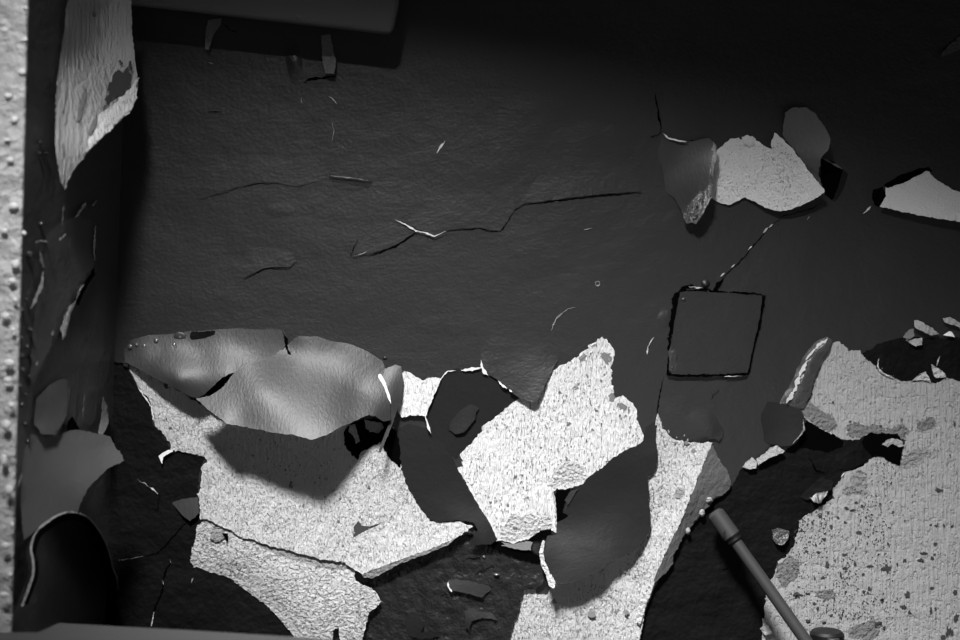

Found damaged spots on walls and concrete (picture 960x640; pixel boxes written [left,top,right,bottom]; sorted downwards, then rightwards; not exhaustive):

flaking render [60,268,95,339]
flaking render [55,0,139,189]
crack [350,233,415,256]
crack [453,192,636,232]
crack [657,203,821,417]
flaking render [711,133,843,211]
flaking render [872,167,960,222]
flaking render [129,365,473,640]
flaking render [448,337,644,564]
flaking render [509,414,731,640]
flaking render [760,596,797,640]
flaking render [771,341,960,640]